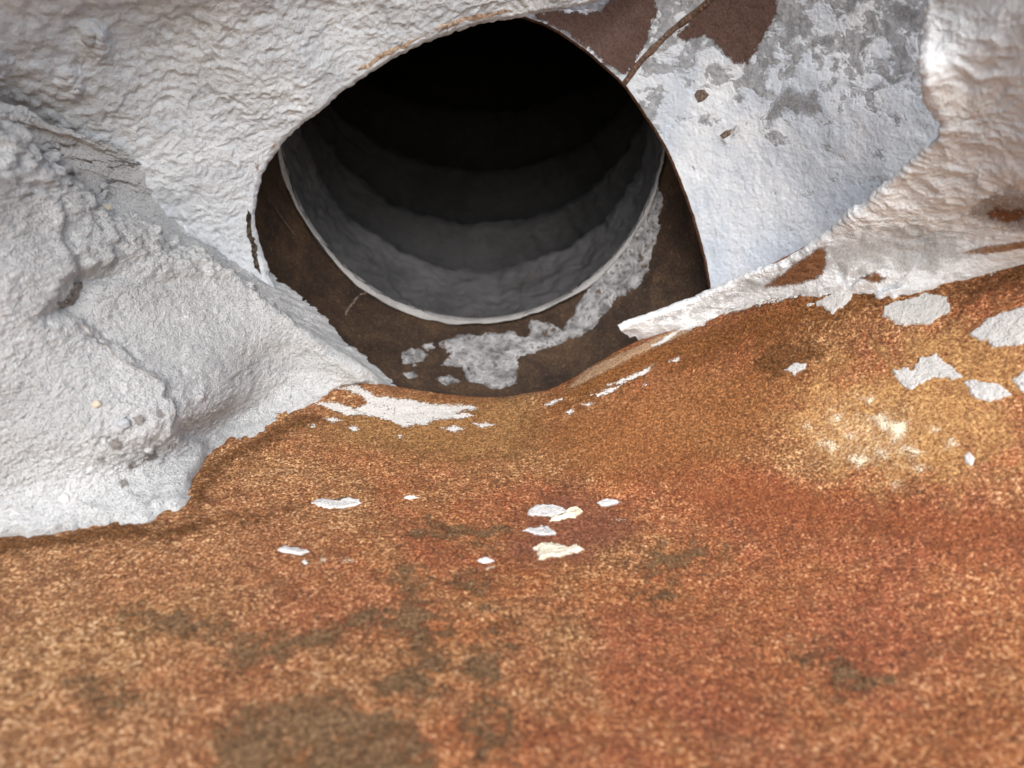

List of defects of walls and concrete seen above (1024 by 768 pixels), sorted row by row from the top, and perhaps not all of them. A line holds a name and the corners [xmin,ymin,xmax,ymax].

peeling [535,0,659,74]
crack [246,187,296,274]
peeling [401,187,663,389]
peeling [807,290,853,315]
peeling [882,292,950,326]
peeling [969,306,1024,348]
corrosion [309,272,1024,483]
peeling [892,353,1024,403]
peeling [311,384,493,438]
peeling [311,497,361,509]
peeling [277,545,310,565]
peeling [522,504,584,560]